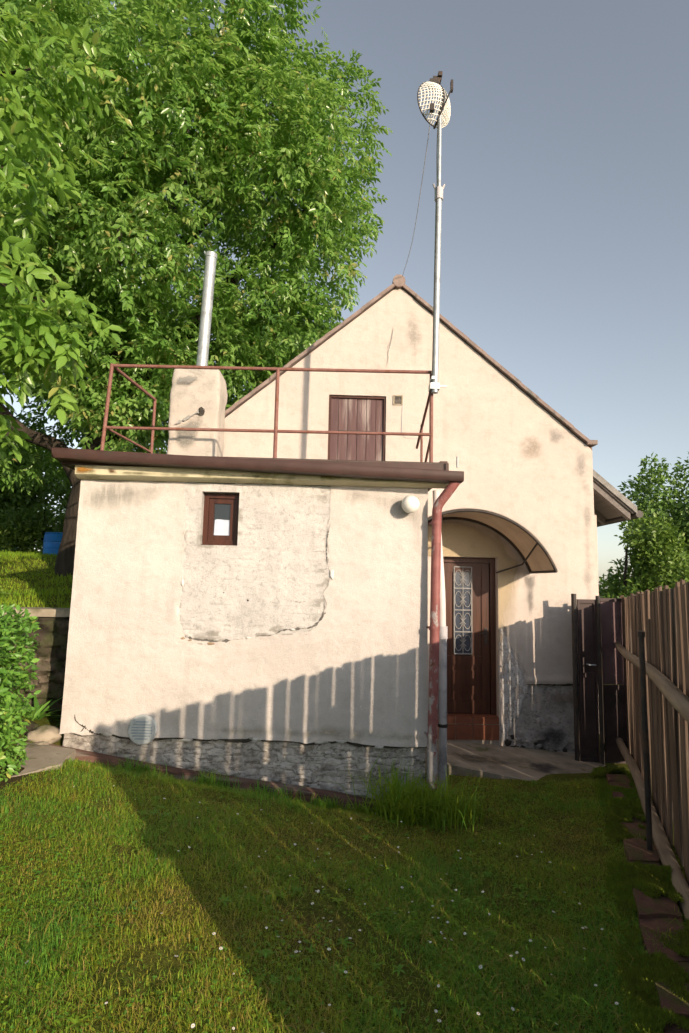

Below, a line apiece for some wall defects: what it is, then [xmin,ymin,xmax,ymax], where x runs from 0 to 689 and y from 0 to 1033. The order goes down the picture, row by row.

peeling [176,482,334,645]
spalling [499,629,580,753]